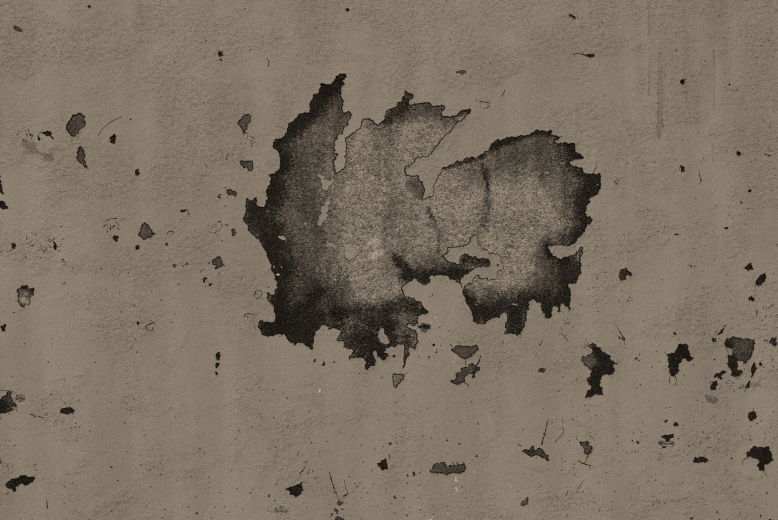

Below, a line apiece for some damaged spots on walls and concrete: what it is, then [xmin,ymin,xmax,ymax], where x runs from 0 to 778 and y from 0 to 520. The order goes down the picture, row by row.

peeling [66,112,86,137]
peeling [76,146,88,169]
peeling [217,73,602,388]
peeling [581,342,617,398]
peeling [664,332,694,385]
peeling [709,325,777,391]
peeling [0,389,25,414]
peeling [518,419,550,461]
peeling [742,438,775,476]
peeling [5,475,35,495]
peeling [394,461,467,499]